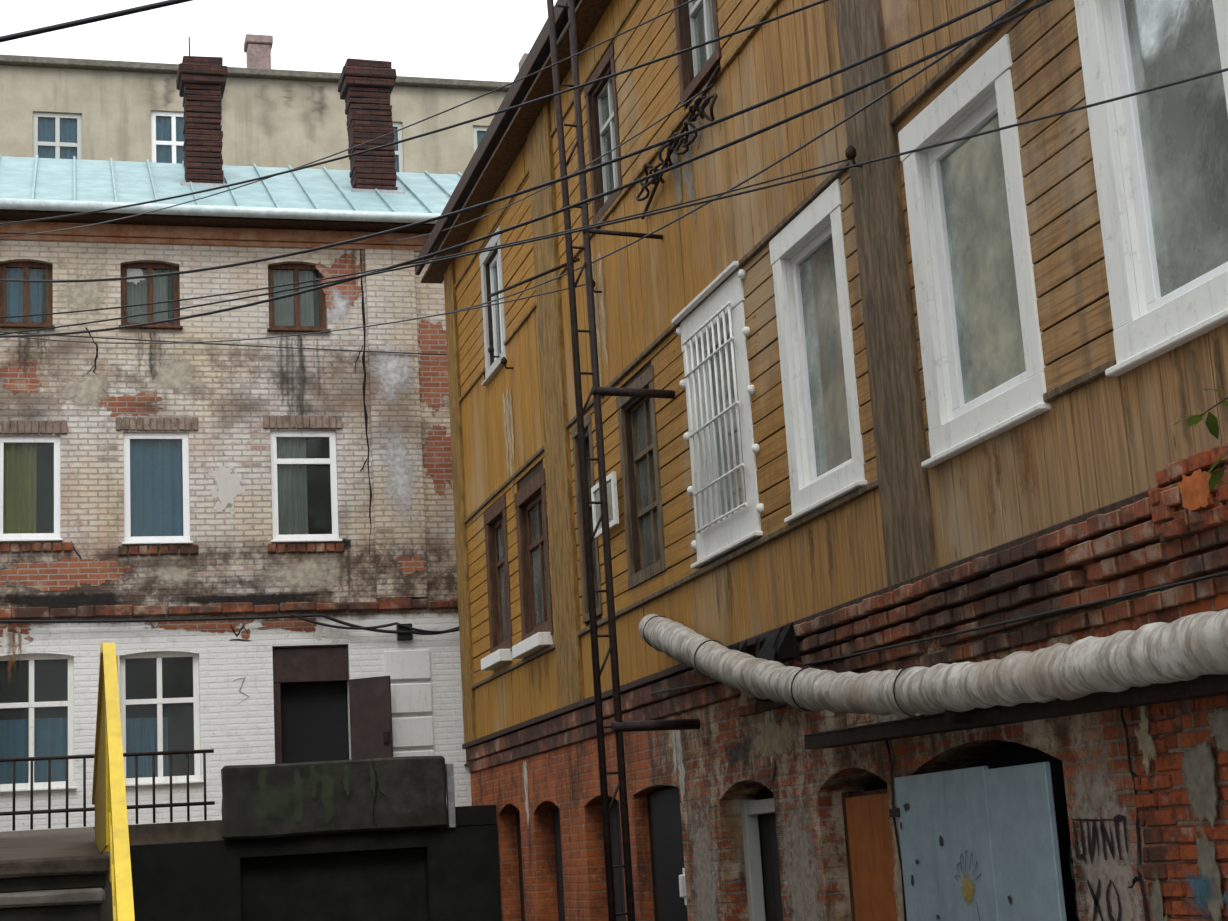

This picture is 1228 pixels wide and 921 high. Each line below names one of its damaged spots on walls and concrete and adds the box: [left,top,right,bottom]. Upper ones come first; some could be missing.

damp [375,344,411,399]
flaking render [418,319,453,496]
flaking render [145,615,350,643]
flaking render [1072,694,1228,921]